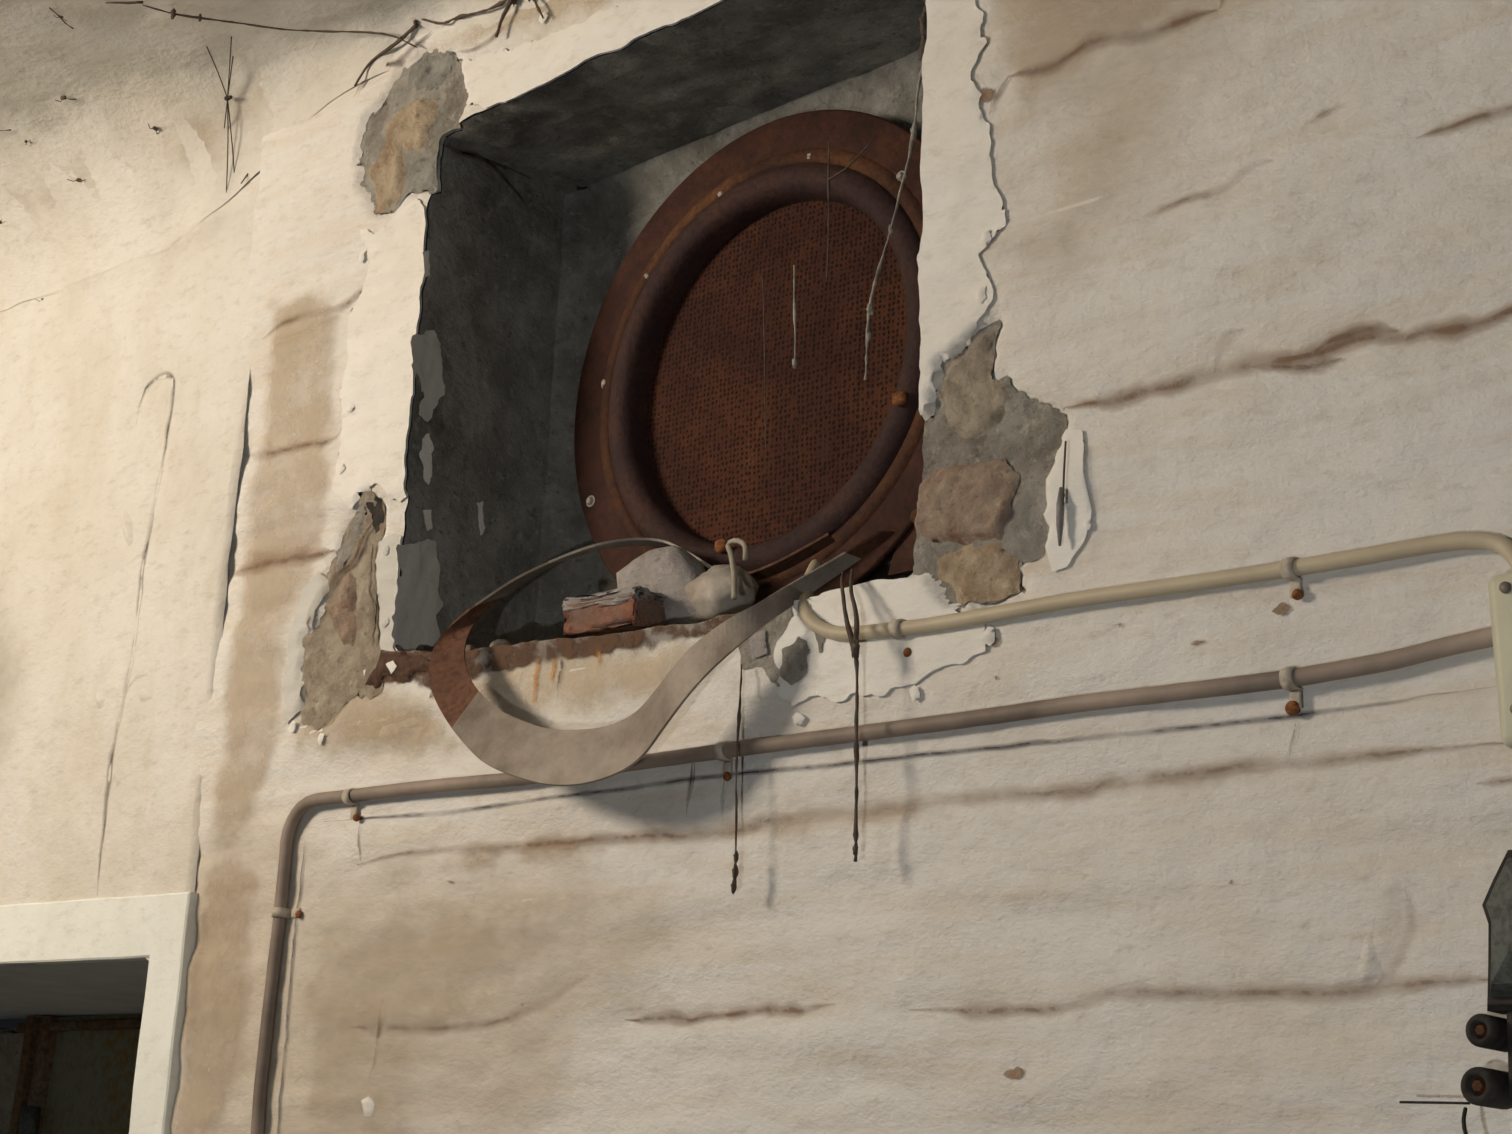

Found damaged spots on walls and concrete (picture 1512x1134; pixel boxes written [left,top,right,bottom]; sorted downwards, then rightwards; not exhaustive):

crack [1427,113,1488,134]
crack [1273,307,1512,370]
peeling [282,0,720,745]
flaking render [738,0,1092,726]
crack [1063,379,1190,410]
water stain [220,299,326,824]
corrosion [380,650,433,698]
corrosion [465,612,740,701]
crack [1155,712,1315,732]
crack [665,741,1060,784]
crack [473,788,626,809]
crack [527,833,673,846]